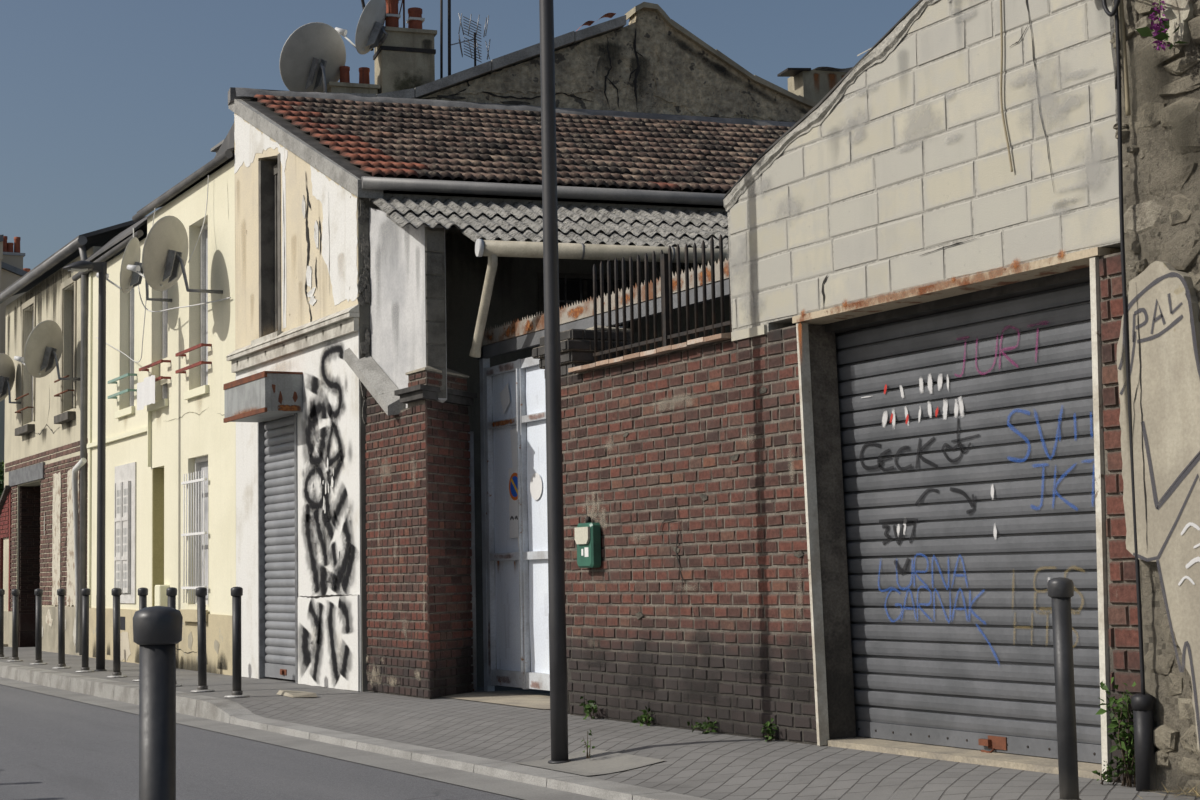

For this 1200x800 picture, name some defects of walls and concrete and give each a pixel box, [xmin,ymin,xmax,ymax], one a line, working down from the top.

crack [423,30,643,112]
water stain [677,40,765,96]
peeling [234,114,288,329]
crack [283,172,330,322]
peeling [302,165,371,306]
corrosion [699,264,729,283]
corrosion [569,307,583,318]
spalling [359,328,370,358]
spalling [359,381,367,424]